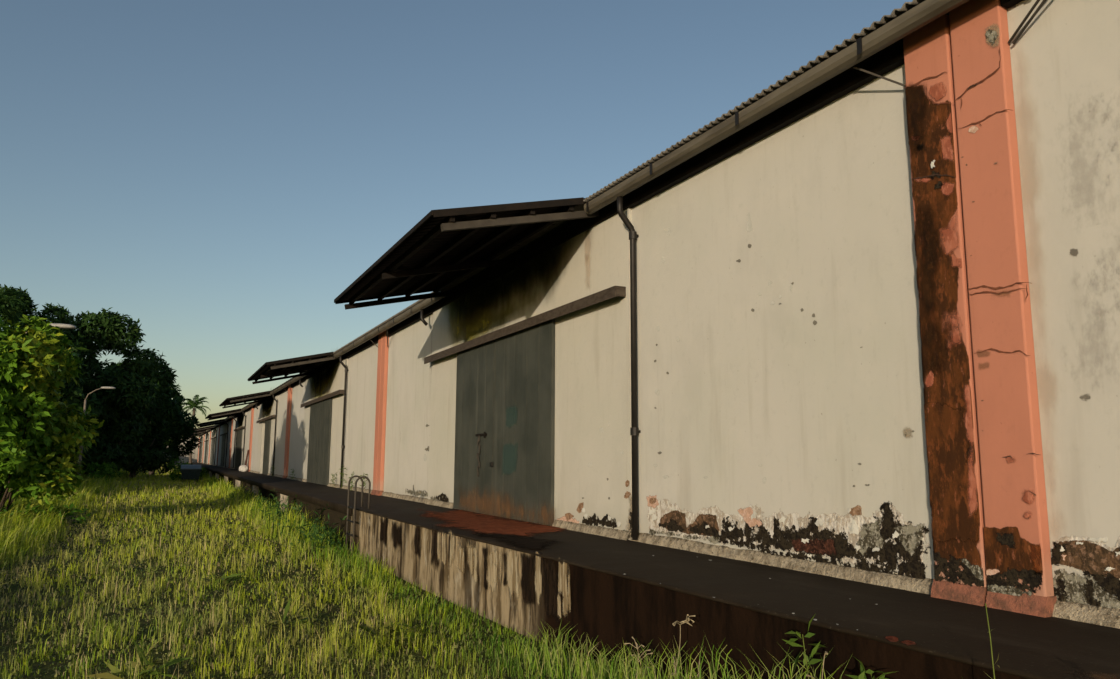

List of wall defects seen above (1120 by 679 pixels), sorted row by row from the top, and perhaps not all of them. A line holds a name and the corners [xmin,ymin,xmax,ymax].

crack [905,56,1013,133]
corrosion [905,82,1043,575]
crack [967,282,1029,298]
water stain [380,485,571,622]
peeling [557,502,586,523]
peeling [646,495,930,575]
spalling [1051,535,1120,601]